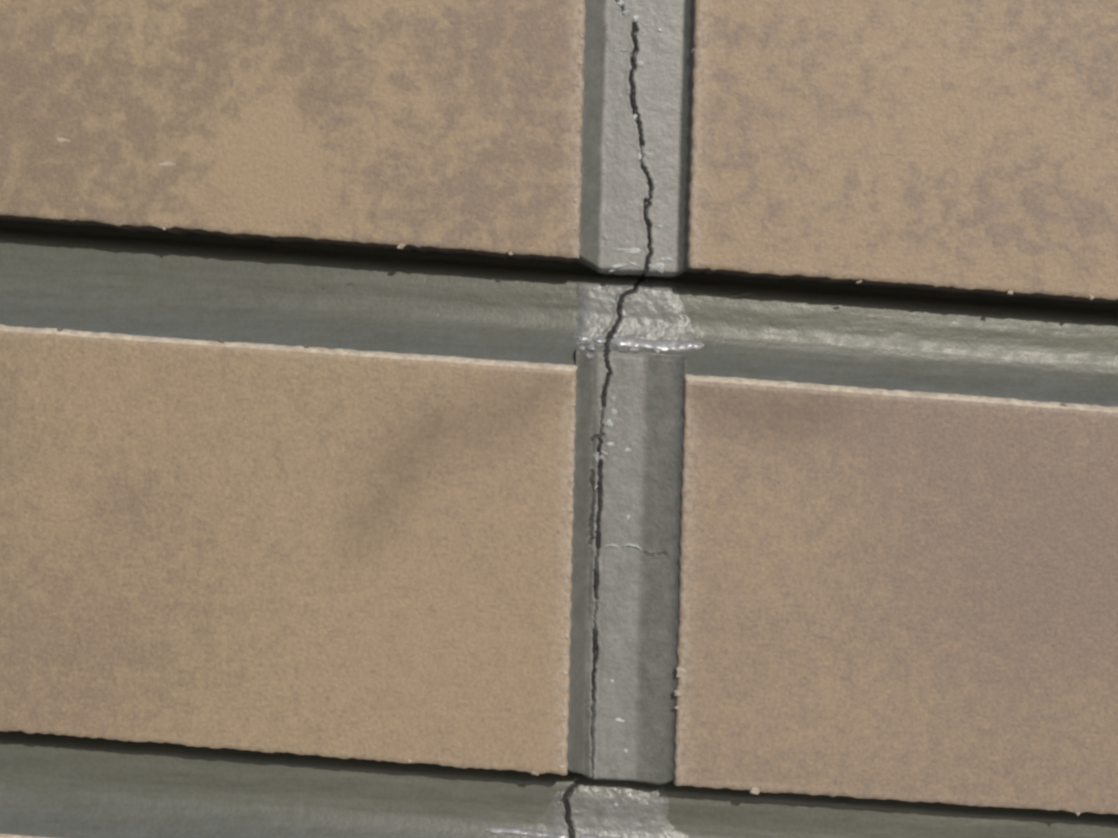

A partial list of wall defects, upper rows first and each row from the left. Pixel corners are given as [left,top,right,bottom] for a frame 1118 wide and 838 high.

crack [560,0,666,838]